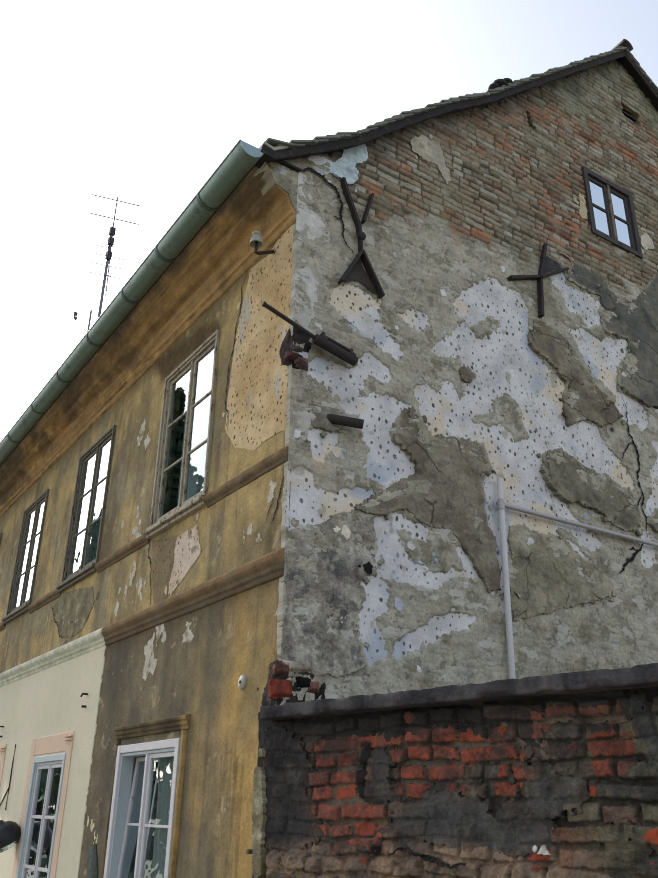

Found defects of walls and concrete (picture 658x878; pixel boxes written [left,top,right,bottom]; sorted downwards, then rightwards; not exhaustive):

crack [289,167,359,252]
flaking render [222,224,658,708]
crack [619,398,648,574]
flaking render [164,513,201,598]
peeling [142,623,166,681]
peeling [182,621,194,643]
spalling [309,700,637,864]
spalling [512,845,558,873]
spalling [643,826,658,865]